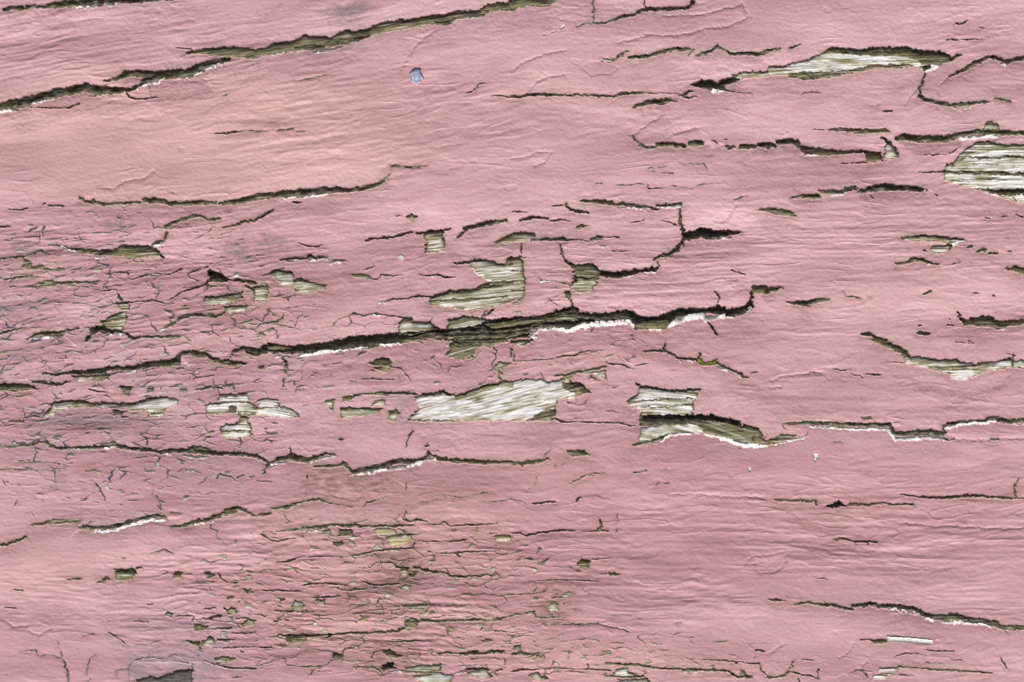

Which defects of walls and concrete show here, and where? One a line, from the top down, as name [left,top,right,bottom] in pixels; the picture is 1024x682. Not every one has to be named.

crack [0,0,561,114]
peeling [689,46,963,95]
crack [456,38,1024,271]
peeling [917,140,1024,204]
crack [0,173,391,300]
peeling [378,224,661,317]
crack [0,269,758,397]
peeling [860,331,1024,381]
peeling [204,389,301,439]
peeling [324,364,769,451]
crack [0,420,630,682]
crack [792,600,1024,670]